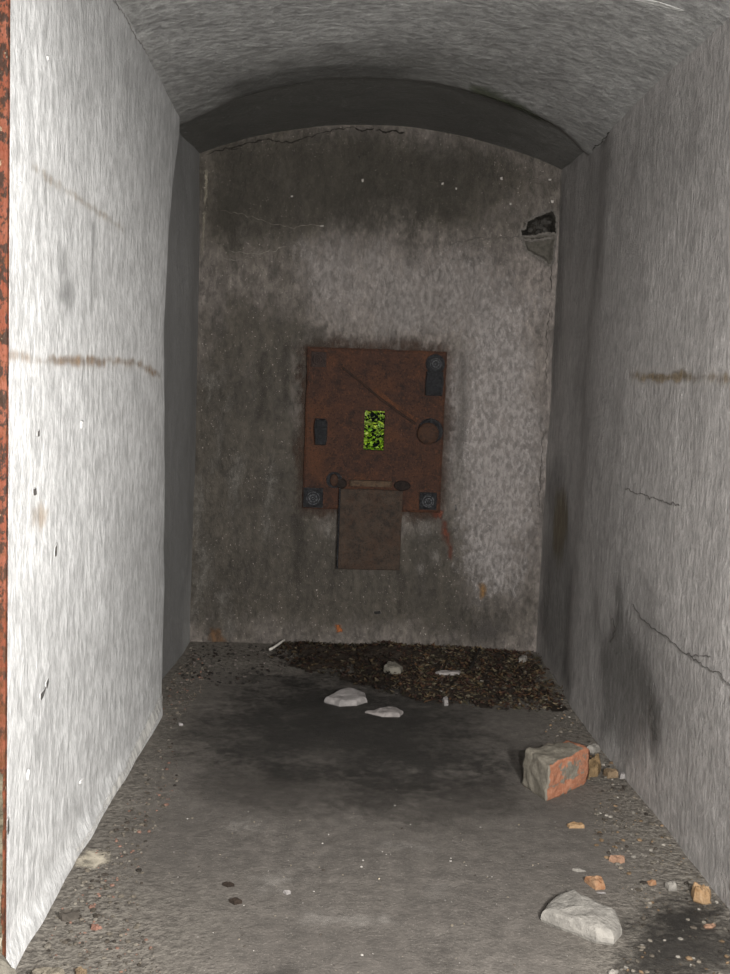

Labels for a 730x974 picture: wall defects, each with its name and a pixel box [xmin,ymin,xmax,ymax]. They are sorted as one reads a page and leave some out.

crack [207,127,404,155]
spalling [519,200,558,267]
crack [633,604,730,686]